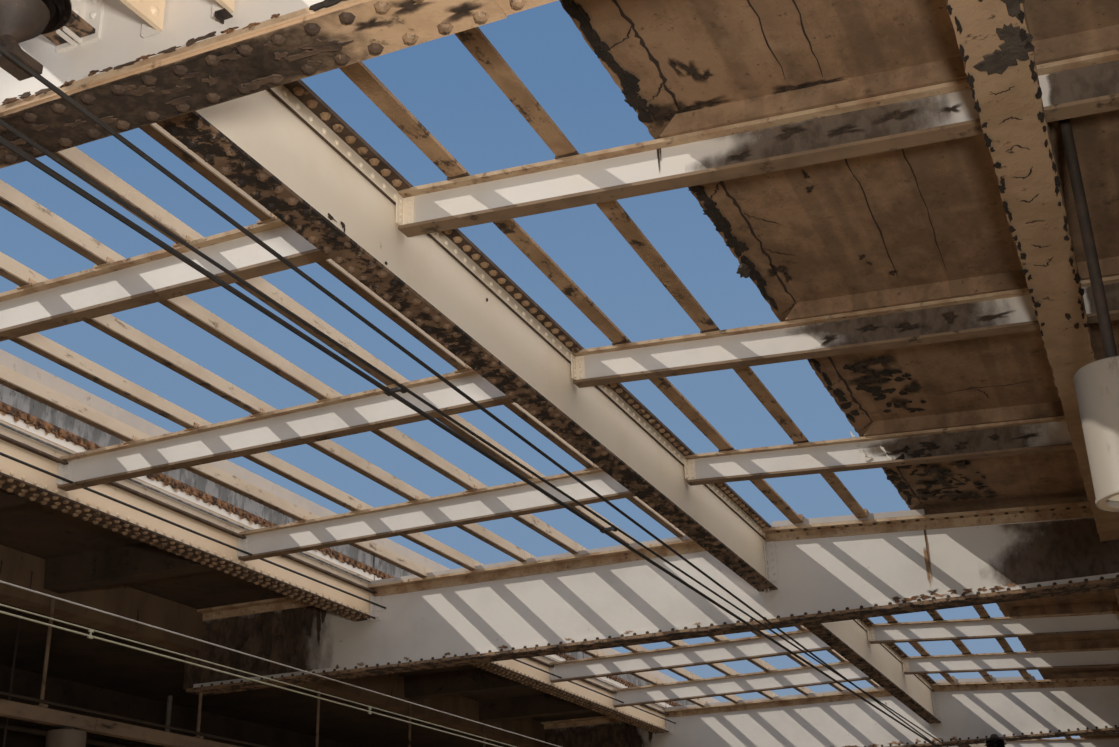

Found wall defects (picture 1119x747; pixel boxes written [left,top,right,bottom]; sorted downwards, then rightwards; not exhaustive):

corrosion [2,13,280,106]
corrosion [309,0,345,11]
corrosion [357,0,426,30]
corrosion [449,3,480,21]
spalling [562,0,658,123]
crack [747,0,785,78]
crack [792,0,823,77]
spalling [689,185,778,311]
crack [845,159,898,277]
crack [902,148,947,271]
peeling [947,0,1089,336]
peeling [808,357,998,505]